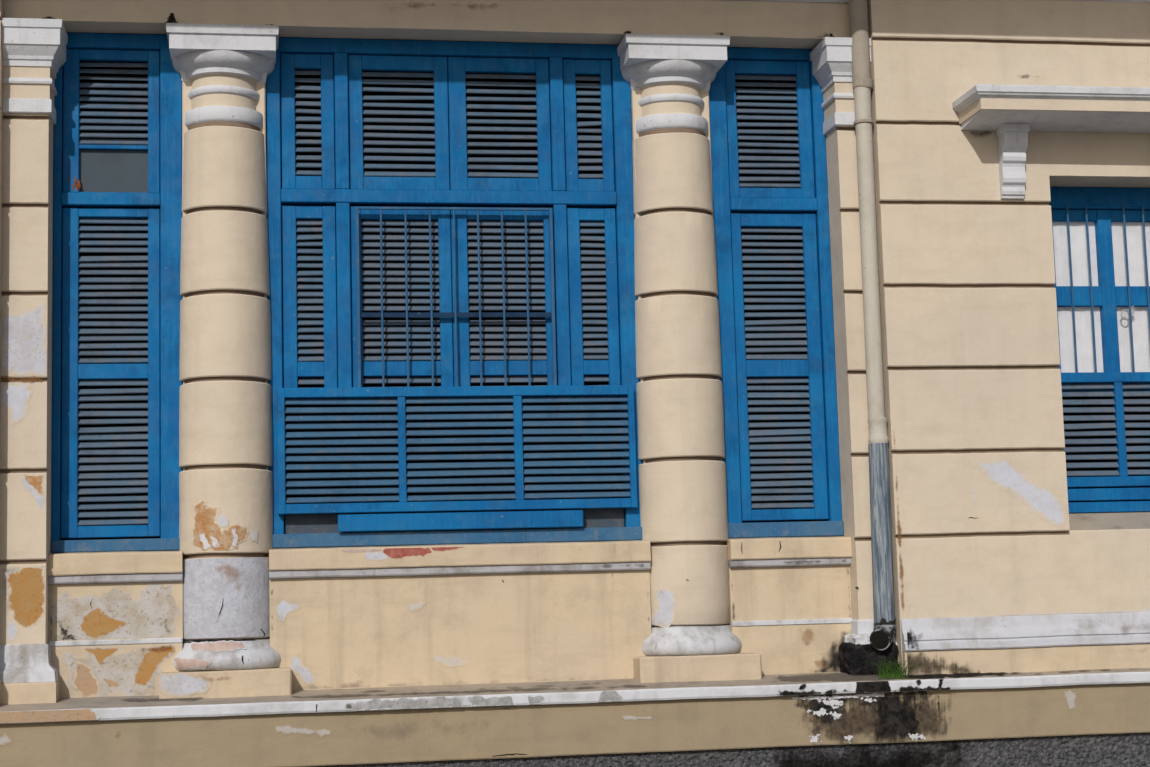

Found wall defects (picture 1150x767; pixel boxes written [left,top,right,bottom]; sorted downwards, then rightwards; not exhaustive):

flaking render [21,474,45,510]
flaking render [337,547,464,561]
peeling [0,497,300,723]